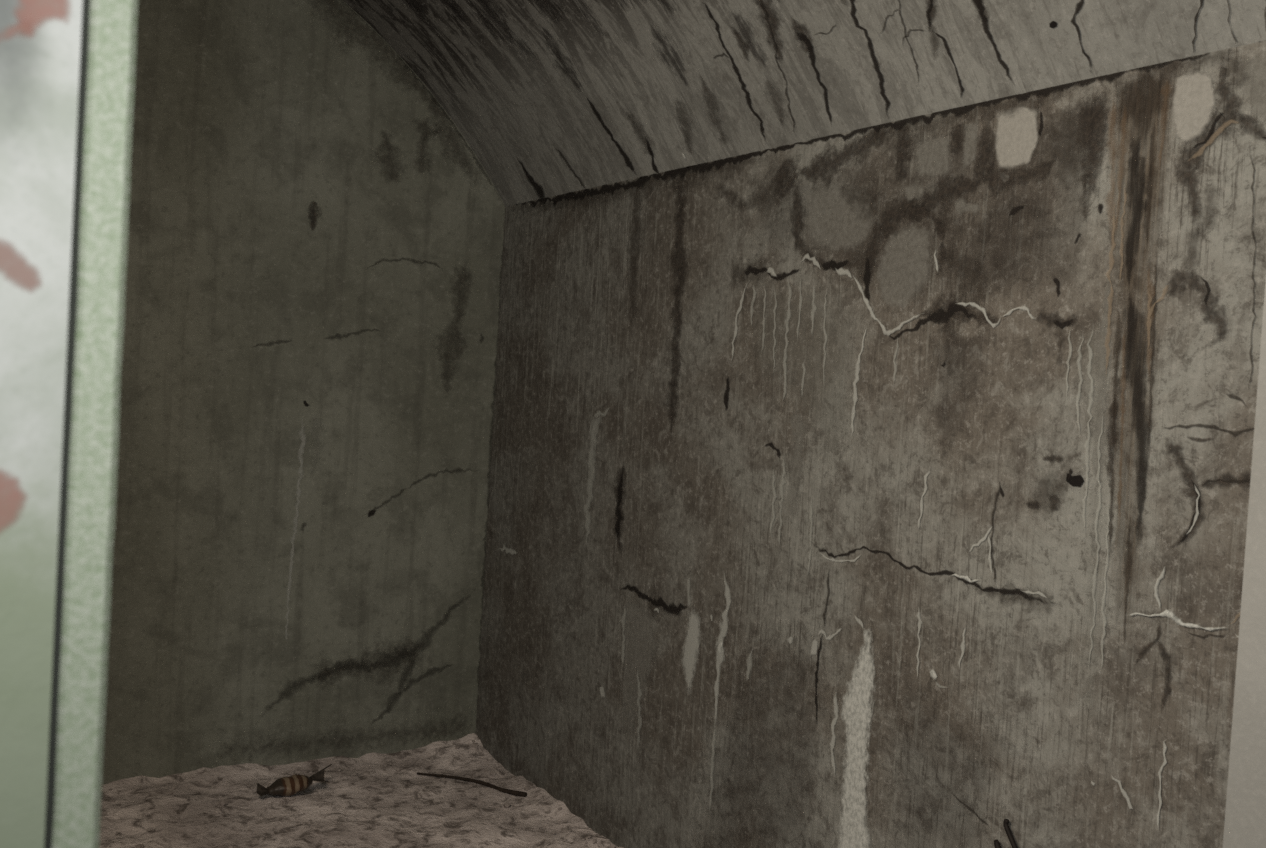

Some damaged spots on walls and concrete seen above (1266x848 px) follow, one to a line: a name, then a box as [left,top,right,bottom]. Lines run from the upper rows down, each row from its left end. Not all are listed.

water stain [777,128,885,270]
crack [516,0,1236,207]
water stain [863,125,1052,299]
water stain [1084,100,1106,189]
water stain [751,281,827,396]
crack [724,254,1076,410]
crack [1130,157,1256,705]
crack [622,585,686,614]
crack [819,484,1047,624]
efflorescence [811,617,875,848]